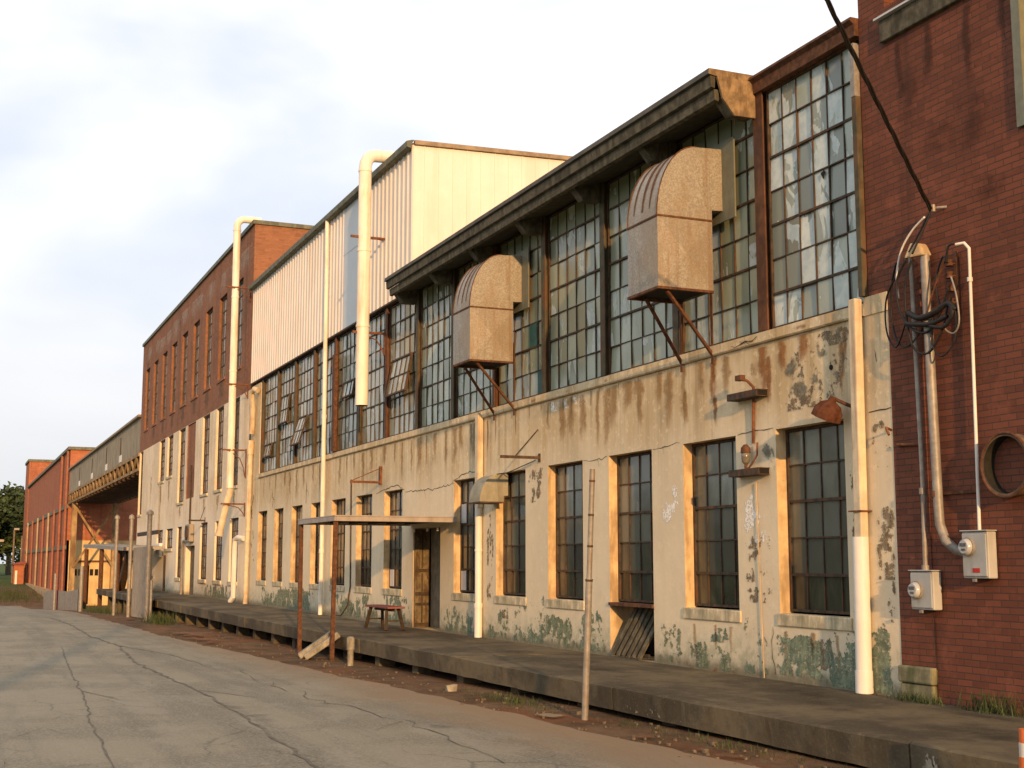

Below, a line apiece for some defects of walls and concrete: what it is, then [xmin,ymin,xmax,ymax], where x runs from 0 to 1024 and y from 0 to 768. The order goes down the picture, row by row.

peeling [787,326,848,411]
crack [377,471,473,494]
peeling [529,467,543,502]
peeling [871,506,896,695]